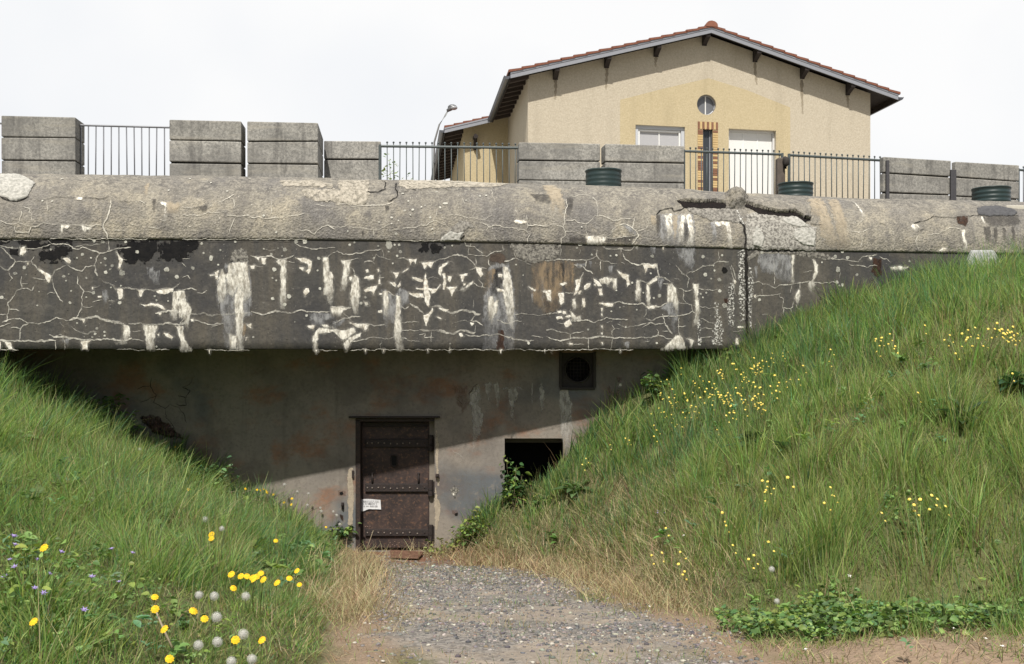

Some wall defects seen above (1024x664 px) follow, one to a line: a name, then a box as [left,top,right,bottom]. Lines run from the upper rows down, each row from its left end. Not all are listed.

crack [0,195,131,349]
leakage [117,288,191,346]
leakage [117,239,199,264]
leakage [210,255,294,347]
leakage [323,257,360,307]
leakage [378,288,409,340]
leakage [483,263,515,318]
rust [529,260,585,305]
crack [184,179,1017,349]
leakage [635,264,678,321]
spalling [657,193,834,262]
spalling [141,415,183,439]